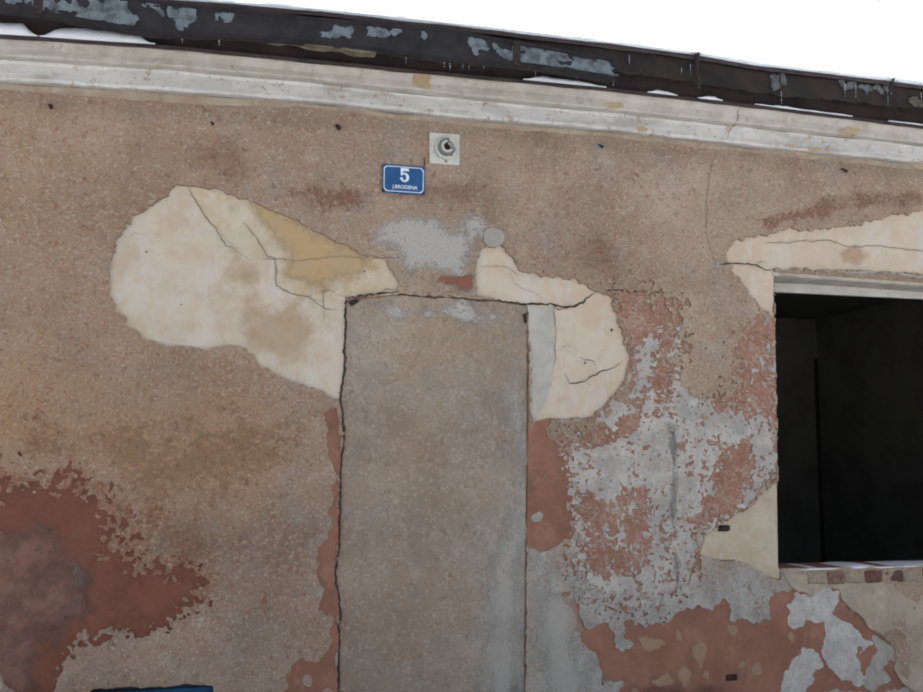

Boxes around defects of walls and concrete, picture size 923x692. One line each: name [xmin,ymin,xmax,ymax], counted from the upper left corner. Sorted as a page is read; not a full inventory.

peeling [5,0,139,25]
peeling [142,3,197,31]
peeling [215,12,234,23]
peeling [320,25,354,39]
peeling [366,26,402,38]
peeling [468,37,618,76]
peeling [413,73,431,90]
crack [706,154,922,271]
spalling [108,185,399,692]
crack [190,191,667,692]
peeling [475,211,923,692]
flaking render [0,454,212,692]